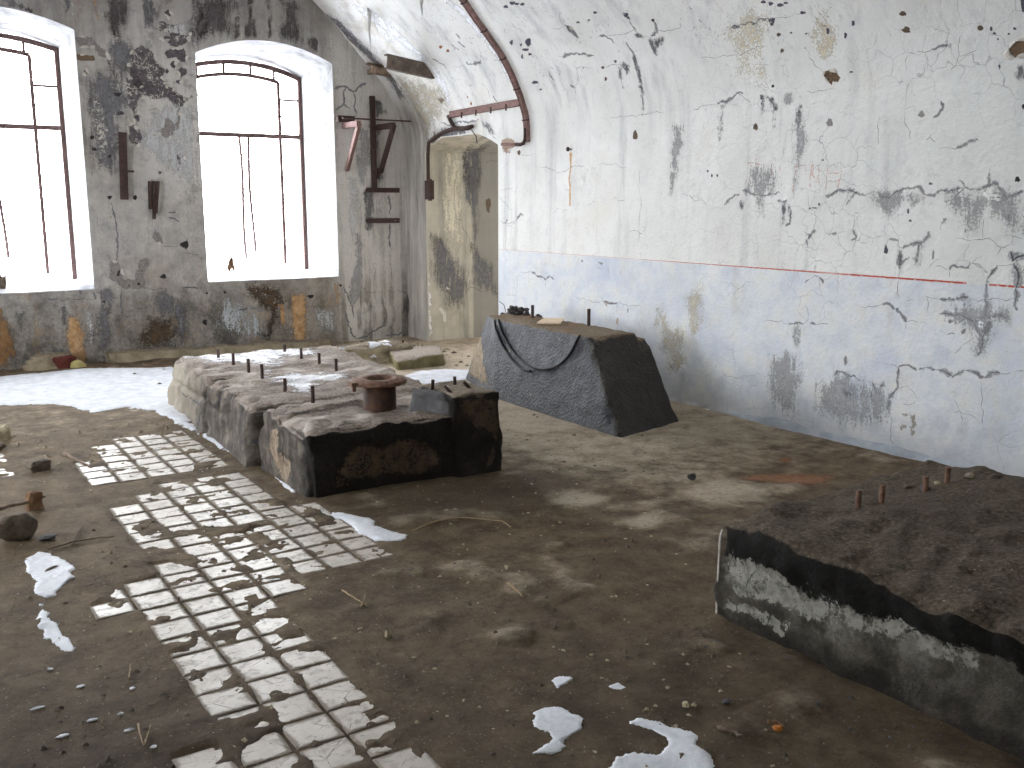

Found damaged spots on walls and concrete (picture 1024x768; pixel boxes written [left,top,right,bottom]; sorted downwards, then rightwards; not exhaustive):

spalling [76,36,111,76]
peeling [110,9,201,186]
crack [694,92,750,110]
spalling [822,68,853,85]
crack [904,101,977,149]
water stain [355,4,498,336]
rust [0,309,17,368]
rust [66,302,88,363]
water stain [139,290,188,349]
rust [278,292,308,340]
water stain [767,324,801,411]
crack [681,170,1024,444]